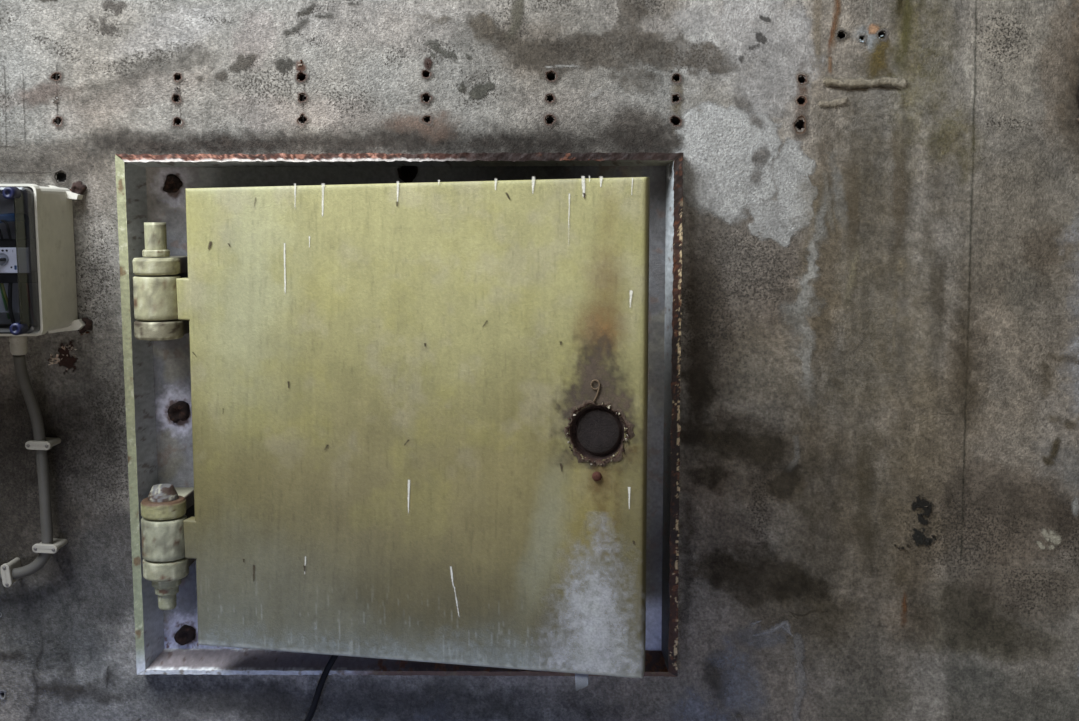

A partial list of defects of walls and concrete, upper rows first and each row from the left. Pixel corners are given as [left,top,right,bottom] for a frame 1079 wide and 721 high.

rust [829,0,839,69]
damp [468,0,891,380]
damp [683,283,799,498]
damp [549,562,637,673]